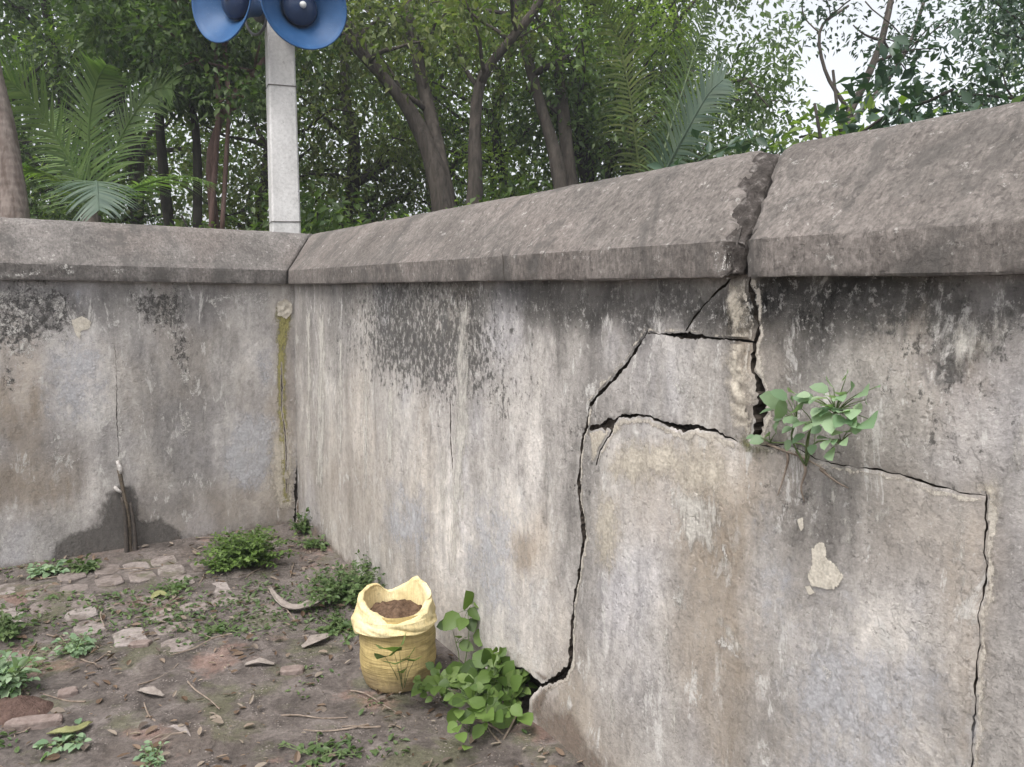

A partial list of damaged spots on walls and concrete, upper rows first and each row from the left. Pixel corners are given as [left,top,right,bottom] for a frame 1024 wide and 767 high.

water stain [0,290,72,391]
peeling [0,289,91,358]
water stain [131,293,186,350]
water stain [53,486,181,560]
crack [541,277,999,767]
peeling [805,542,843,595]